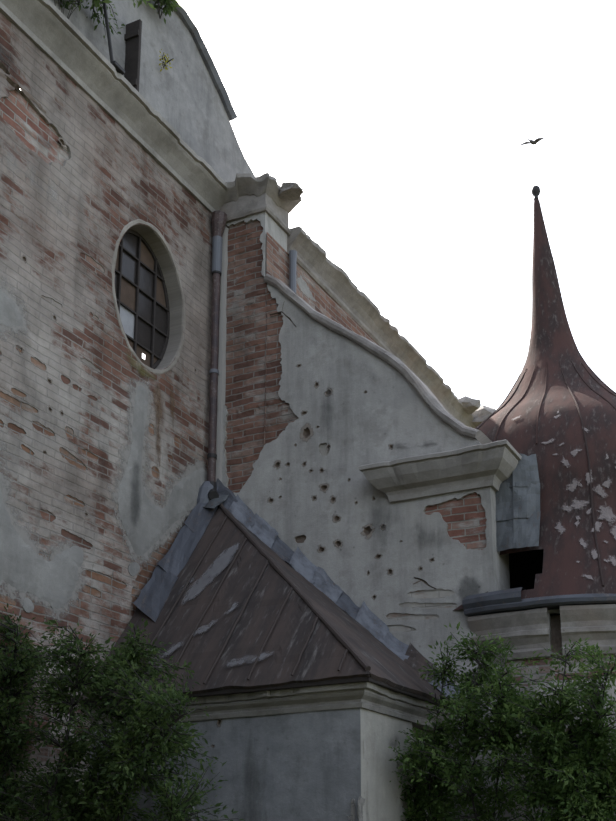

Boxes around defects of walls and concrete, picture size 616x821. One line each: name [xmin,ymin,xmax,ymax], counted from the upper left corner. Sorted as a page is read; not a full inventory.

spalling [0,89,71,166]
spalling [16,345,101,401]
flaking render [223,219,307,493]
peeling [542,438,582,468]
flaking render [423,492,487,550]
peeling [563,470,616,543]
peeling [579,538,616,566]
crack [413,577,437,589]